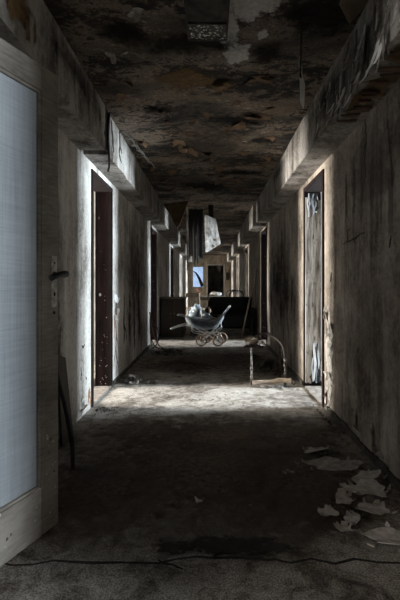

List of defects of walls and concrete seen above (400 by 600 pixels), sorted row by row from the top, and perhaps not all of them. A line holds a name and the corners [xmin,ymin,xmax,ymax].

flaking render [219,0,281,65]
damp [205,114,268,126]
damp [127,236,143,348]